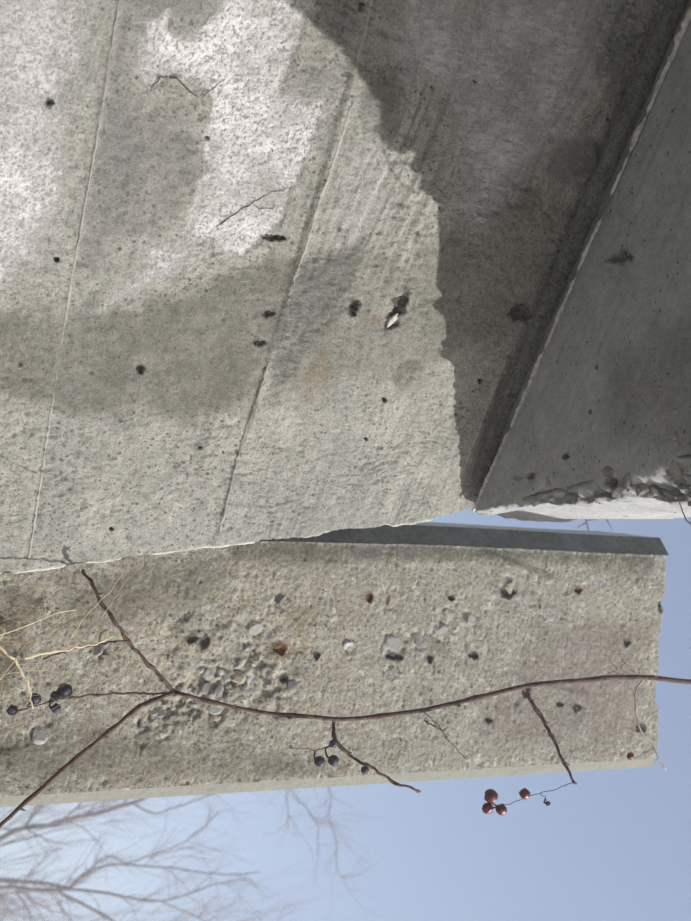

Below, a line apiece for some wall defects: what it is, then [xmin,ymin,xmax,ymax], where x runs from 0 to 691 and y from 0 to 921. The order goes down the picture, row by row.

crack [148,76,225,111]
water stain [410,0,579,196]
water stain [610,7,691,196]
water stain [0,0,78,278]
crack [217,187,290,227]
water stain [148,248,179,277]
water stain [9,275,284,417]
water stain [472,216,603,514]
spalling [572,493,596,505]
spalling [601,465,665,501]
spalling [501,580,517,600]
spalling [437,596,456,636]